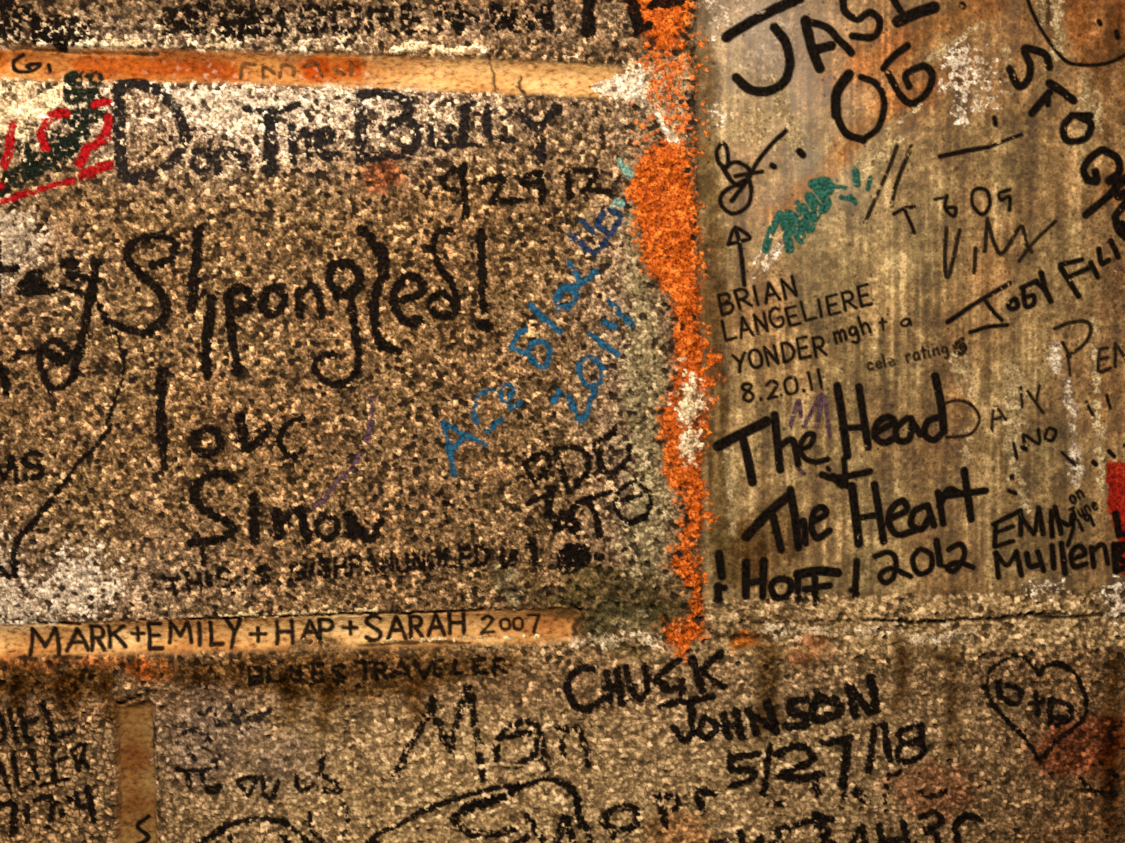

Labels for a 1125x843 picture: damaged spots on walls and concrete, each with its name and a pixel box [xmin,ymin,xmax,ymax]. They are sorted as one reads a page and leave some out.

crack [862,612,1108,628]
water stain [569,631,663,650]
water stain [765,622,969,646]